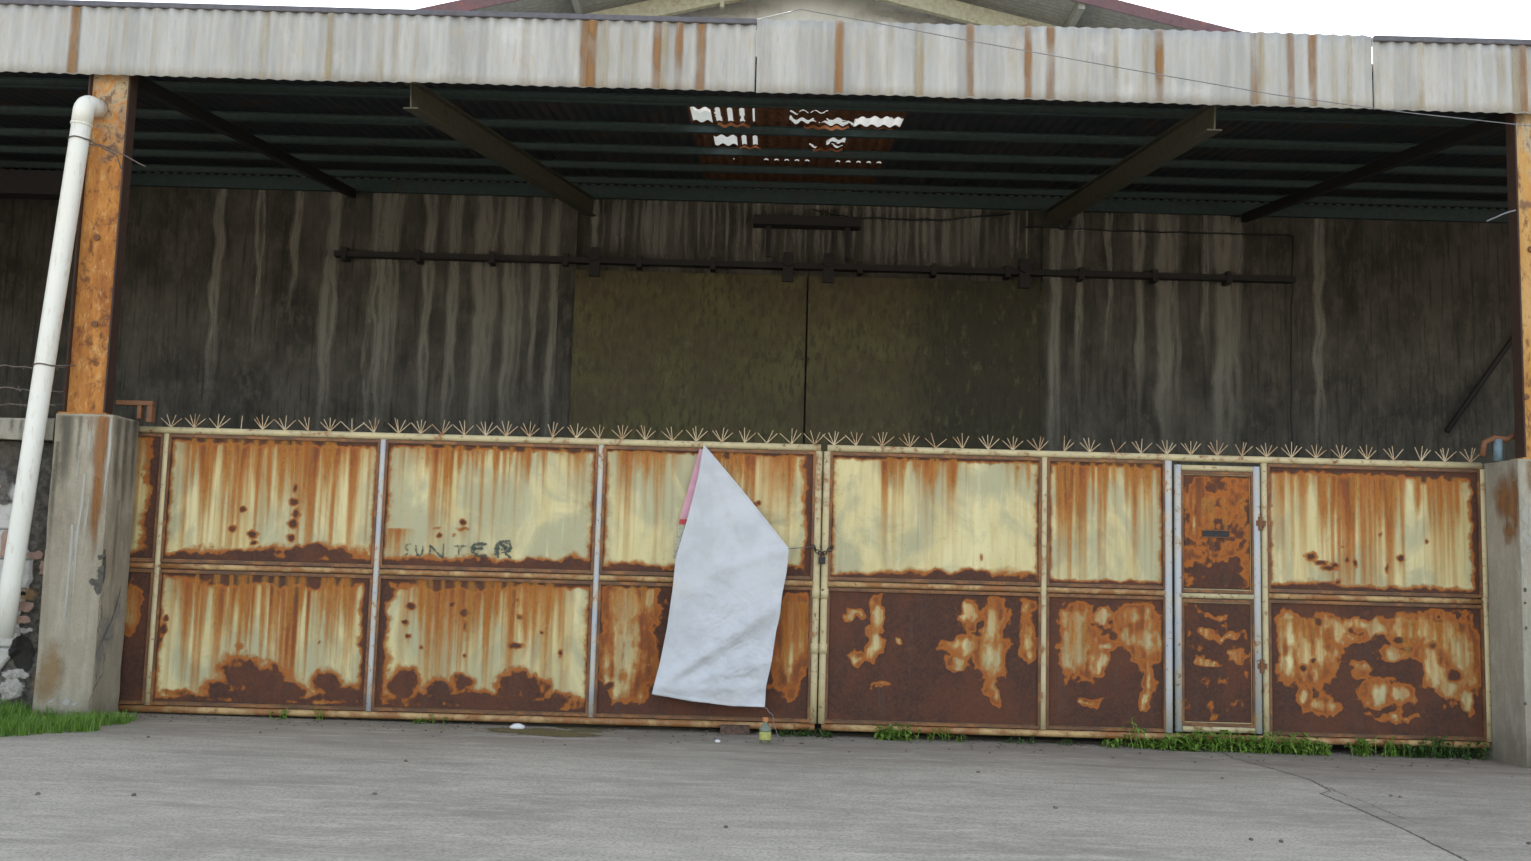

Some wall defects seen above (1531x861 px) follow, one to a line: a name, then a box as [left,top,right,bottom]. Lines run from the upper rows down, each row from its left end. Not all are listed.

rust [653,22,706,90]
water stain [318,192,343,408]
water stain [418,194,562,423]
water stain [1049,213,1084,432]
water stain [1133,213,1181,429]
water stain [1201,215,1241,441]
crack [89,589,121,708]
rust [119,436,813,719]
rust [827,455,1163,729]
rust [1184,475,1252,723]
rust [1270,467,1483,737]
crack [1218,750,1467,861]